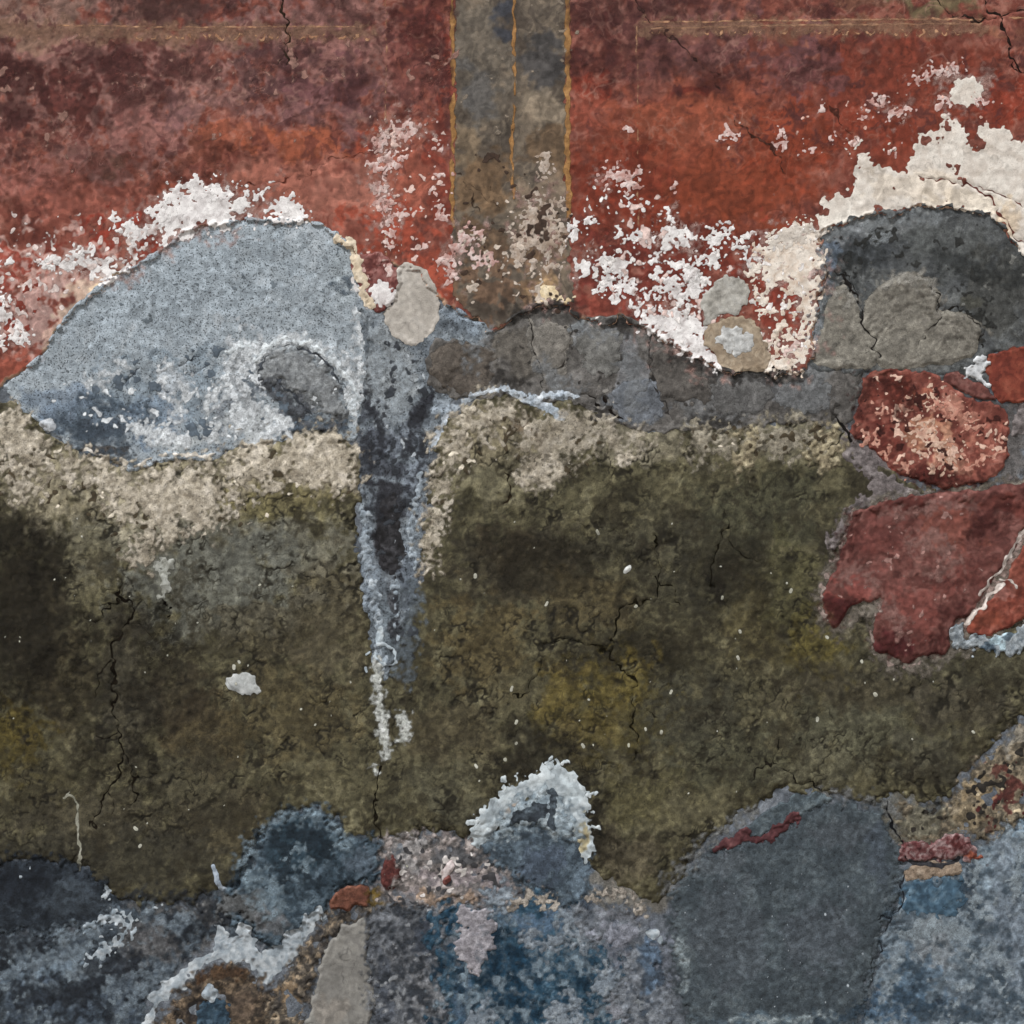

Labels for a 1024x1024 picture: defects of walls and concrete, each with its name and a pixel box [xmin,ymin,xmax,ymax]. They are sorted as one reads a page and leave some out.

crack [937,0,1024,73]
damp [0,400,371,578]
spalling [0,57,1024,691]
damp [411,397,657,583]
damp [680,409,850,483]
crack [834,271,882,358]
crack [84,580,140,829]
crack [512,535,680,755]
damp [466,756,601,864]
spalling [0,850,244,1024]
peeling [361,821,676,1024]
spalling [814,818,1024,1024]